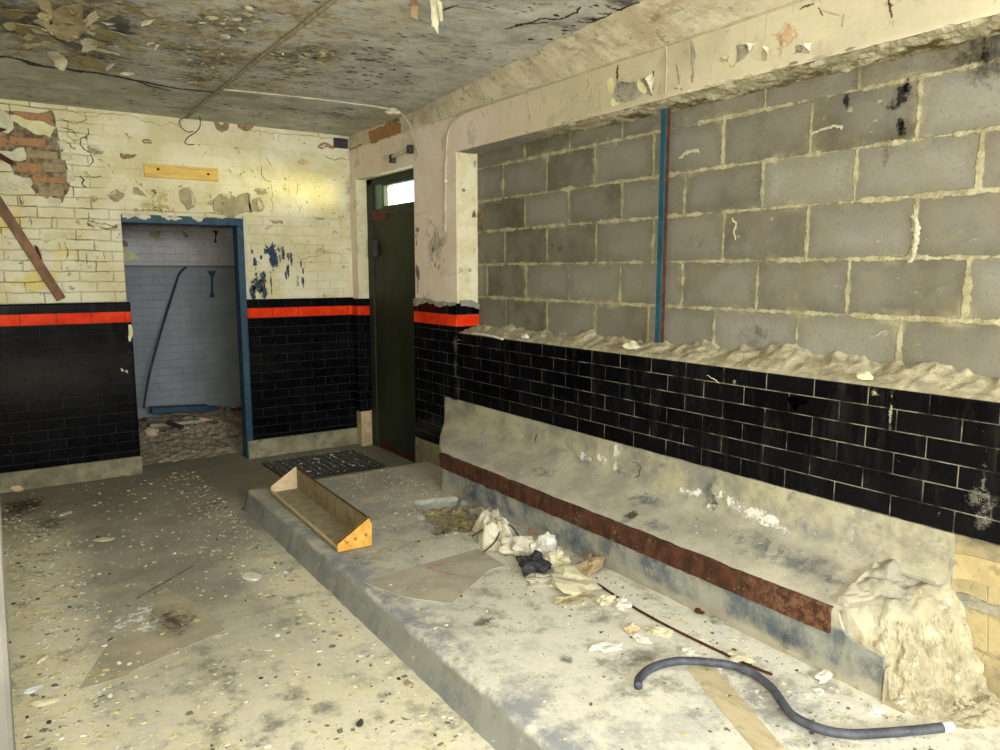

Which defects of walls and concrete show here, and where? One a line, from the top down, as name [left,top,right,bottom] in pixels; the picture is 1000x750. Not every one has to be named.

peeling [0,0,262,84]
crack [505,2,640,29]
peeling [0,109,76,207]
crack [0,56,214,93]
peeling [350,117,401,150]
spalling [460,13,1000,164]
damp [887,79,912,136]
peeling [87,187,268,238]